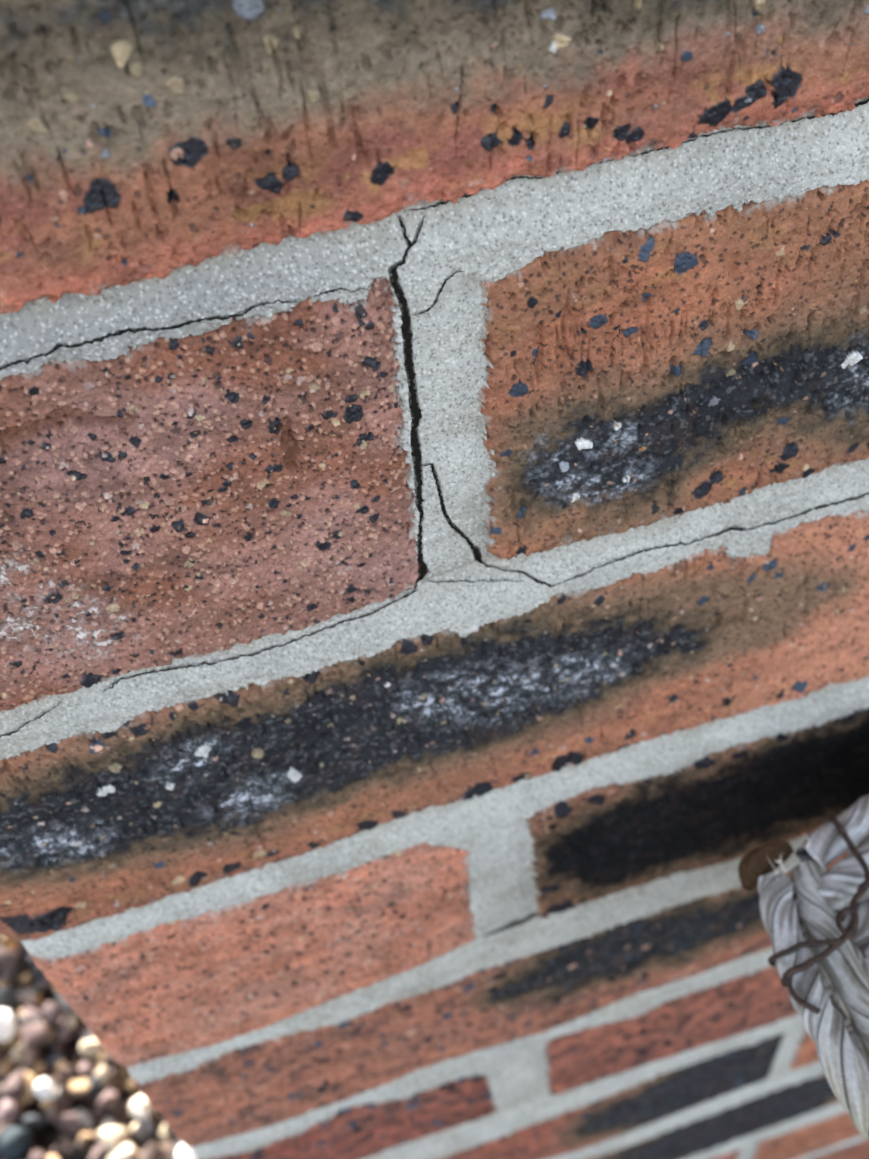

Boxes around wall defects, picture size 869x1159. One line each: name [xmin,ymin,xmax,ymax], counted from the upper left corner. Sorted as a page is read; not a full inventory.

damp [0,0,349,64]
crack [595,99,869,164]
crack [0,172,869,692]
damp [515,329,869,509]
crack [0,702,60,737]
damp [0,602,717,881]
damp [534,708,869,895]